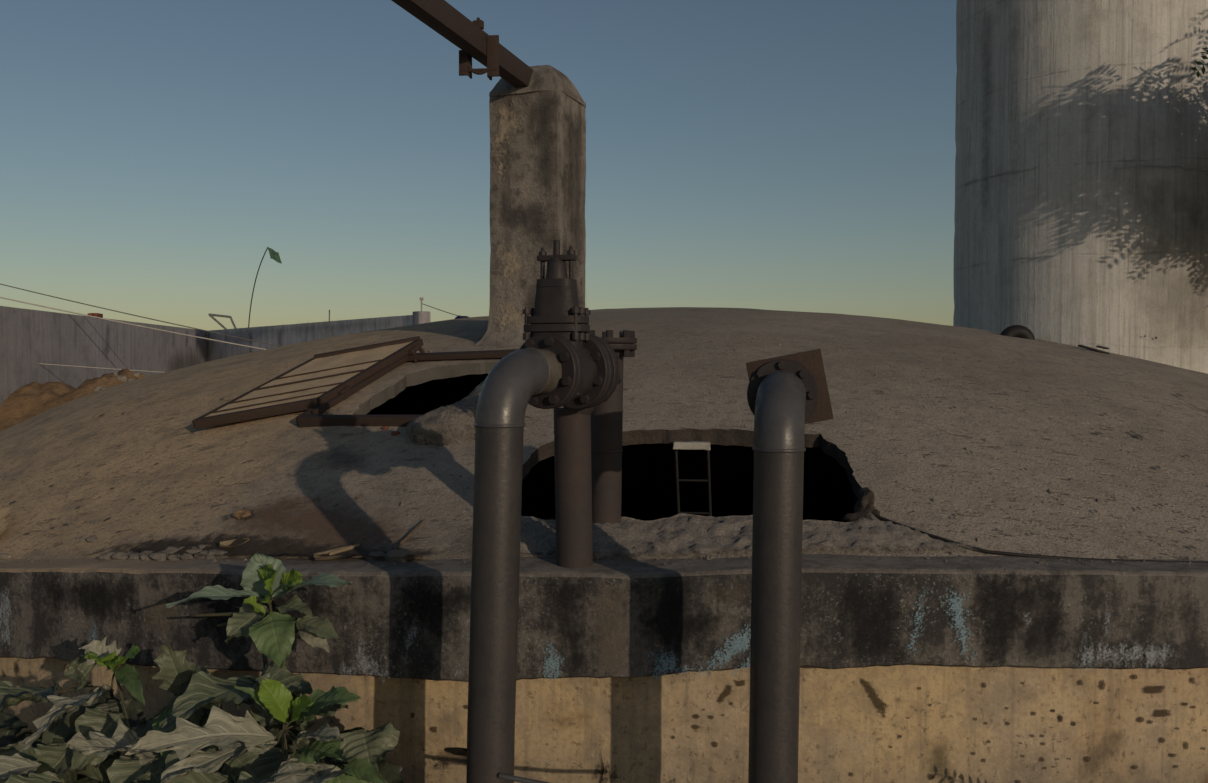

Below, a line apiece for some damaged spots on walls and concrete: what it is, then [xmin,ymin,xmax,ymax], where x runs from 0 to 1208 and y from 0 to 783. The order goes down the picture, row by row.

damp [192,590,333,636]
damp [644,583,719,647]
damp [976,575,1064,661]
damp [1081,644,1172,668]